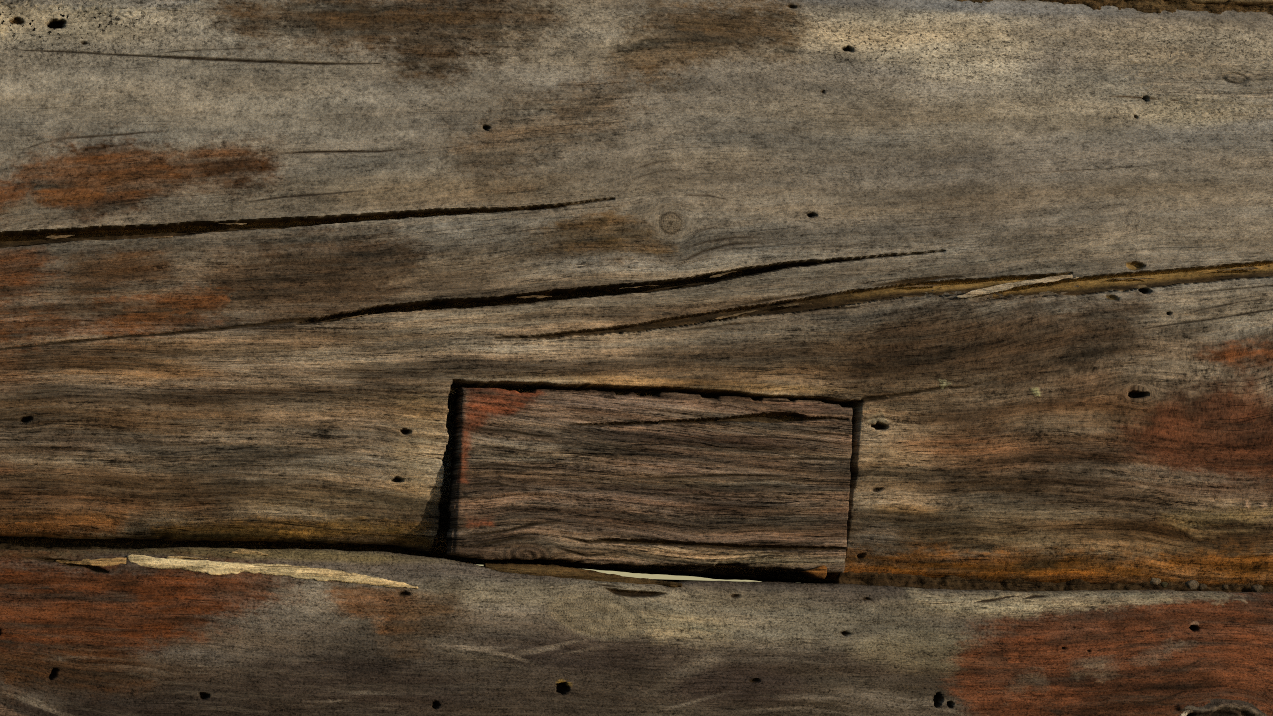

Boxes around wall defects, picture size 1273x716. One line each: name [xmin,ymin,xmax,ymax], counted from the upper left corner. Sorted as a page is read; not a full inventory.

crack [19,130,161,150]
corrosion [0,116,295,232]
crack [277,147,408,155]
corrosion [0,244,240,361]
crack [0,158,1273,351]
corrosion [933,590,1273,716]